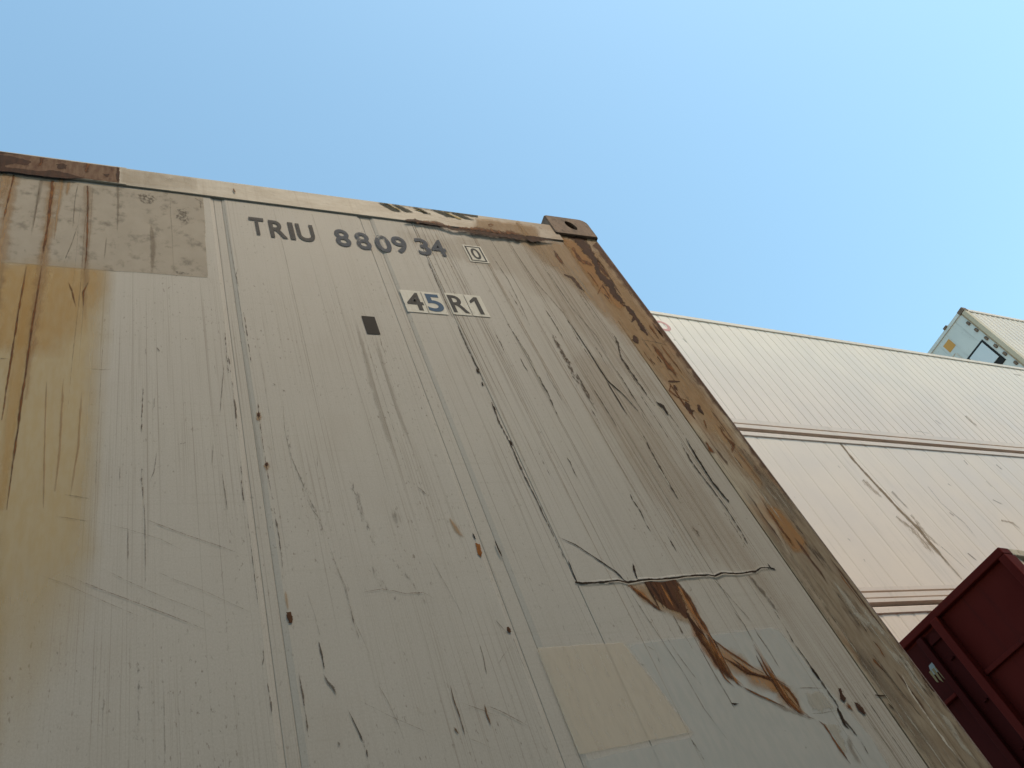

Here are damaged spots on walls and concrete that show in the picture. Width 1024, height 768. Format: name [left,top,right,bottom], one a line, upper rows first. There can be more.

rust [0,152,120,503]
crack [428,262,882,753]
rust [405,219,991,768]
peeling [717,438,934,715]